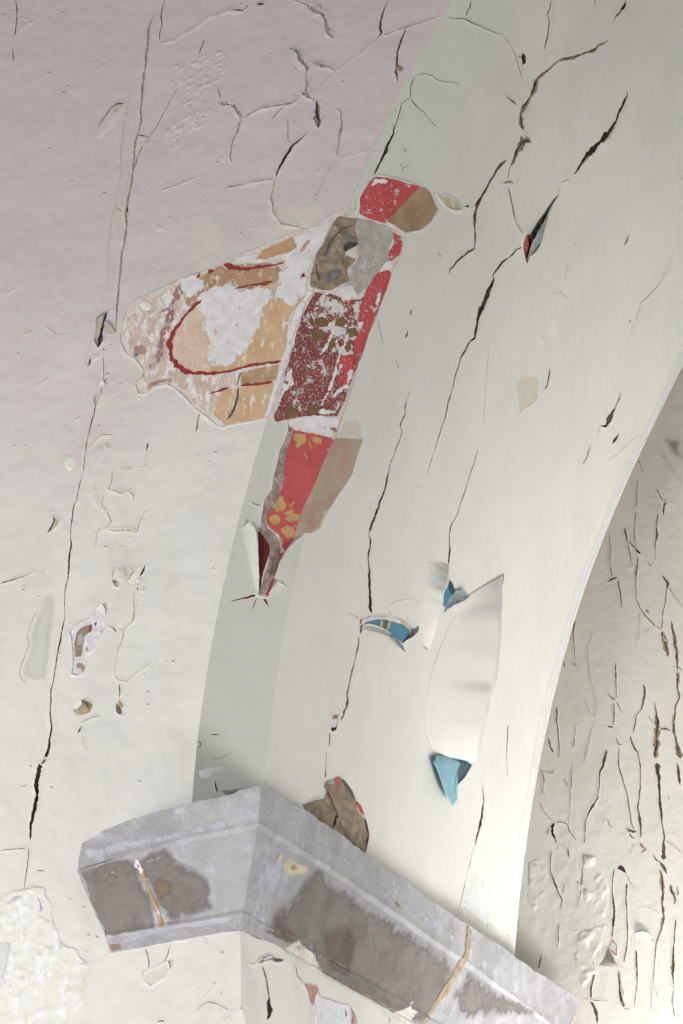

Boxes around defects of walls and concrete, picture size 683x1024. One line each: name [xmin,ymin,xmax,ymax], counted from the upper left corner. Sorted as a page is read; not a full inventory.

flaking render [387,187,464,233]
peeling [179,221,333,367]
crack [624,256,672,344]
crack [0,0,629,888]
flaking render [242,439,362,598]
leakage [81,821,231,947]
flaking render [299,774,370,854]
leakage [249,857,452,1024]
peeling [356,561,504,805]
leakage [464,878,492,929]
leakage [456,975,534,1017]
crack [537,460,683,1024]